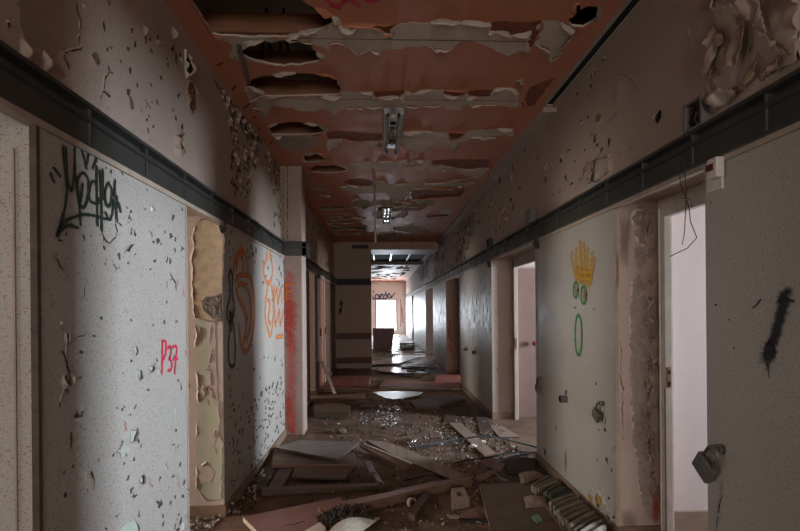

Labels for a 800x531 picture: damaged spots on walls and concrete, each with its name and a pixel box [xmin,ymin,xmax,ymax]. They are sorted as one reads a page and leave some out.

peeling [5,0,86,60]
flaking render [127,25,199,115]
peeling [489,19,544,48]
peeling [701,0,800,115]
peeling [214,78,283,228]
peeling [325,131,383,142]
peeling [431,159,492,169]
peeling [376,188,466,211]
peeling [117,206,137,264]
peeling [126,218,285,526]
peeling [627,247,661,522]
peeling [174,509,188,531]